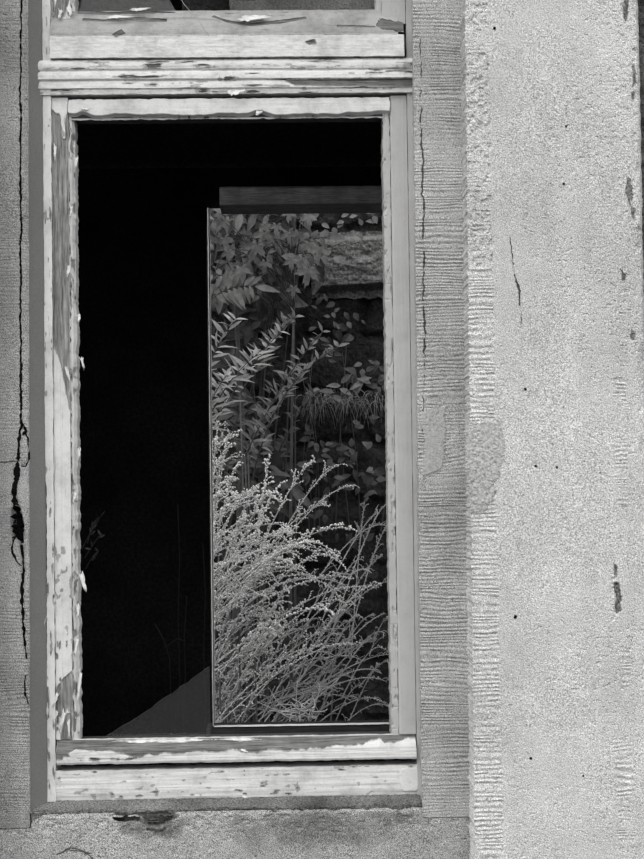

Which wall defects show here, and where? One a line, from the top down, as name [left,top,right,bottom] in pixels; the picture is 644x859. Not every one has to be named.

peeling [46,0,185,38]
peeling [211,14,309,27]
peeling [337,16,404,32]
peeling [43,58,413,96]
crack [0,0,30,705]
peeling [71,448,81,504]
peeling [44,526,87,660]
peeling [46,667,416,790]
peeling [181,768,300,798]
crack [56,847,100,859]